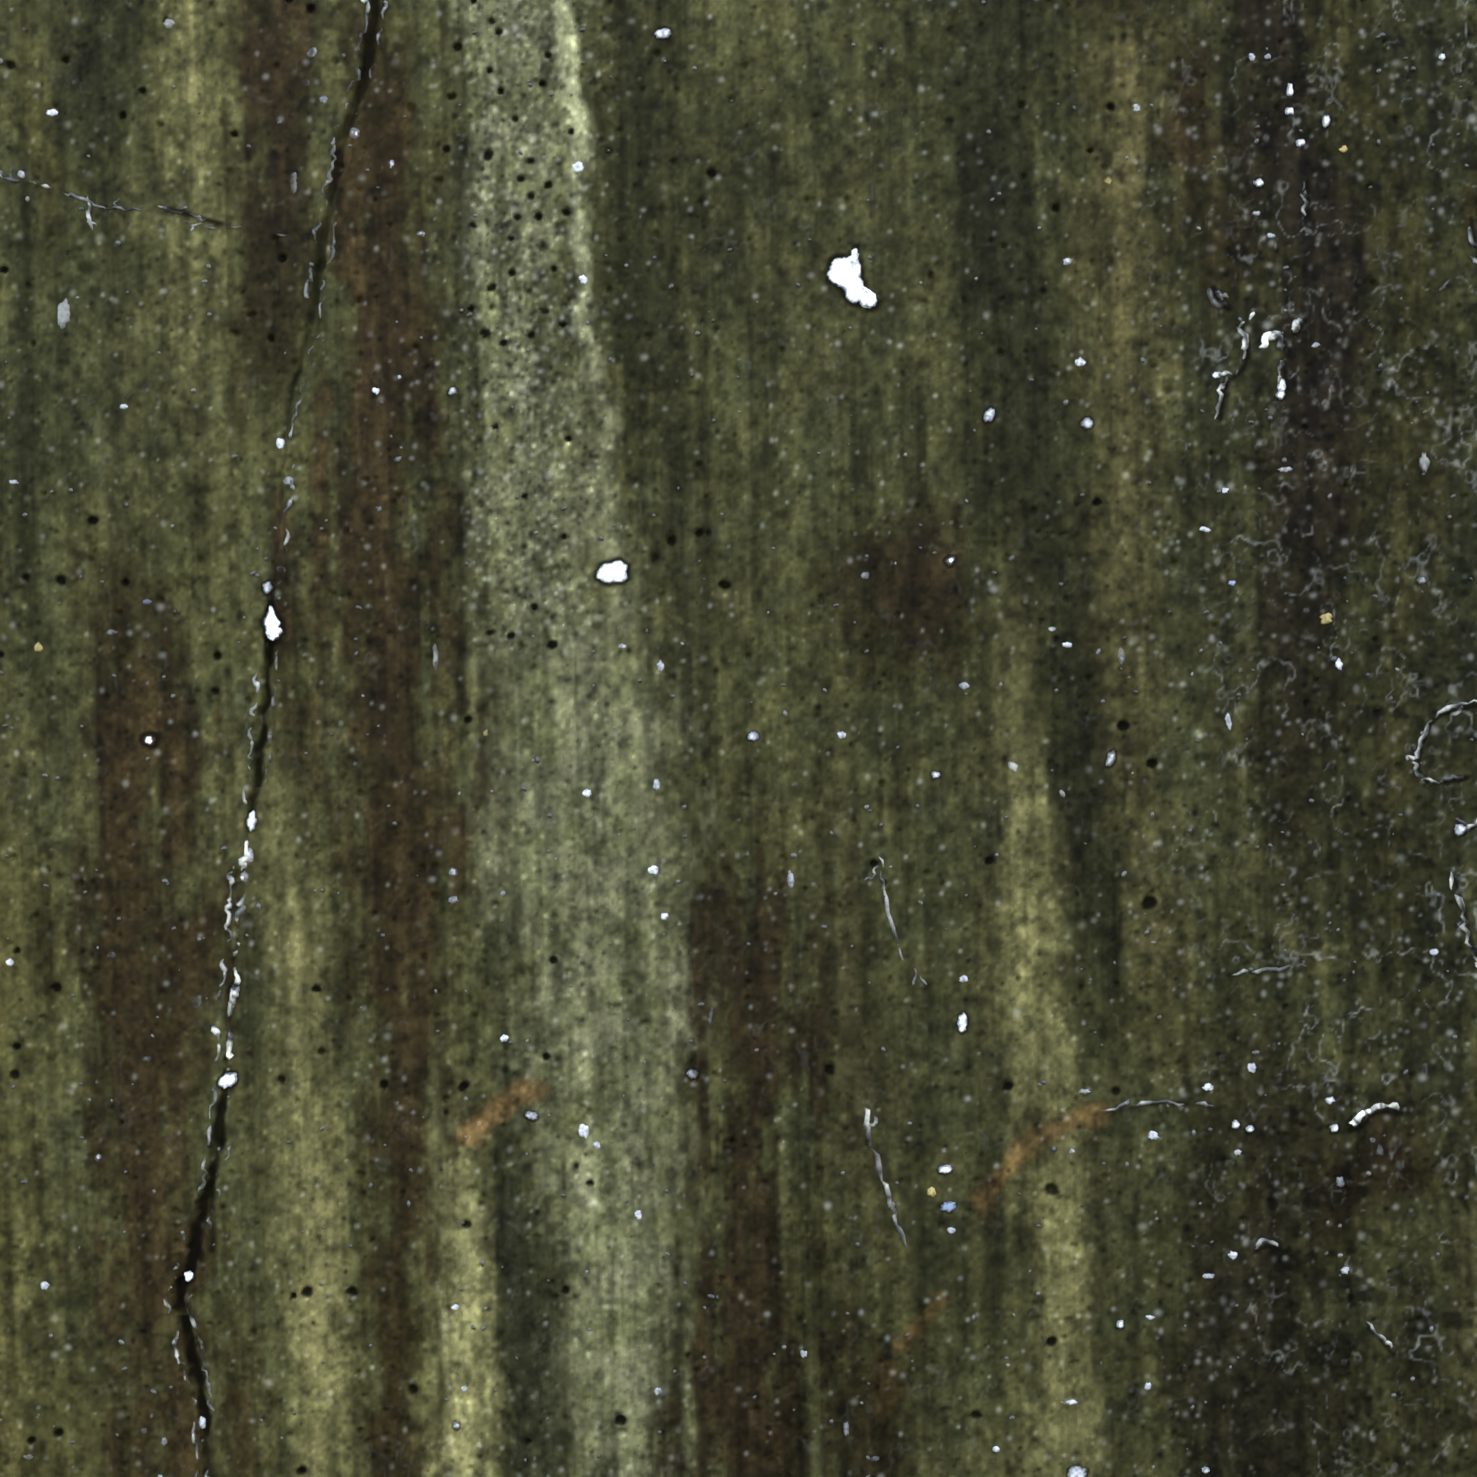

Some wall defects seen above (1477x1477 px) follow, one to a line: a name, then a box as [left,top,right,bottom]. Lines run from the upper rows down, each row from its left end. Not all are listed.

damp [0,0,143,524]
crack [0,0,388,545]
damp [1074,34,1167,520]
damp [1228,0,1374,786]
crack [1468,217,1477,263]
crack [163,580,286,1477]
damp [268,874,361,1477]
damp [422,0,728,1477]
damp [949,0,1126,1477]
damp [1158,1079,1352,1477]
crack [1406,700,1477,832]
crack [1449,871,1477,967]